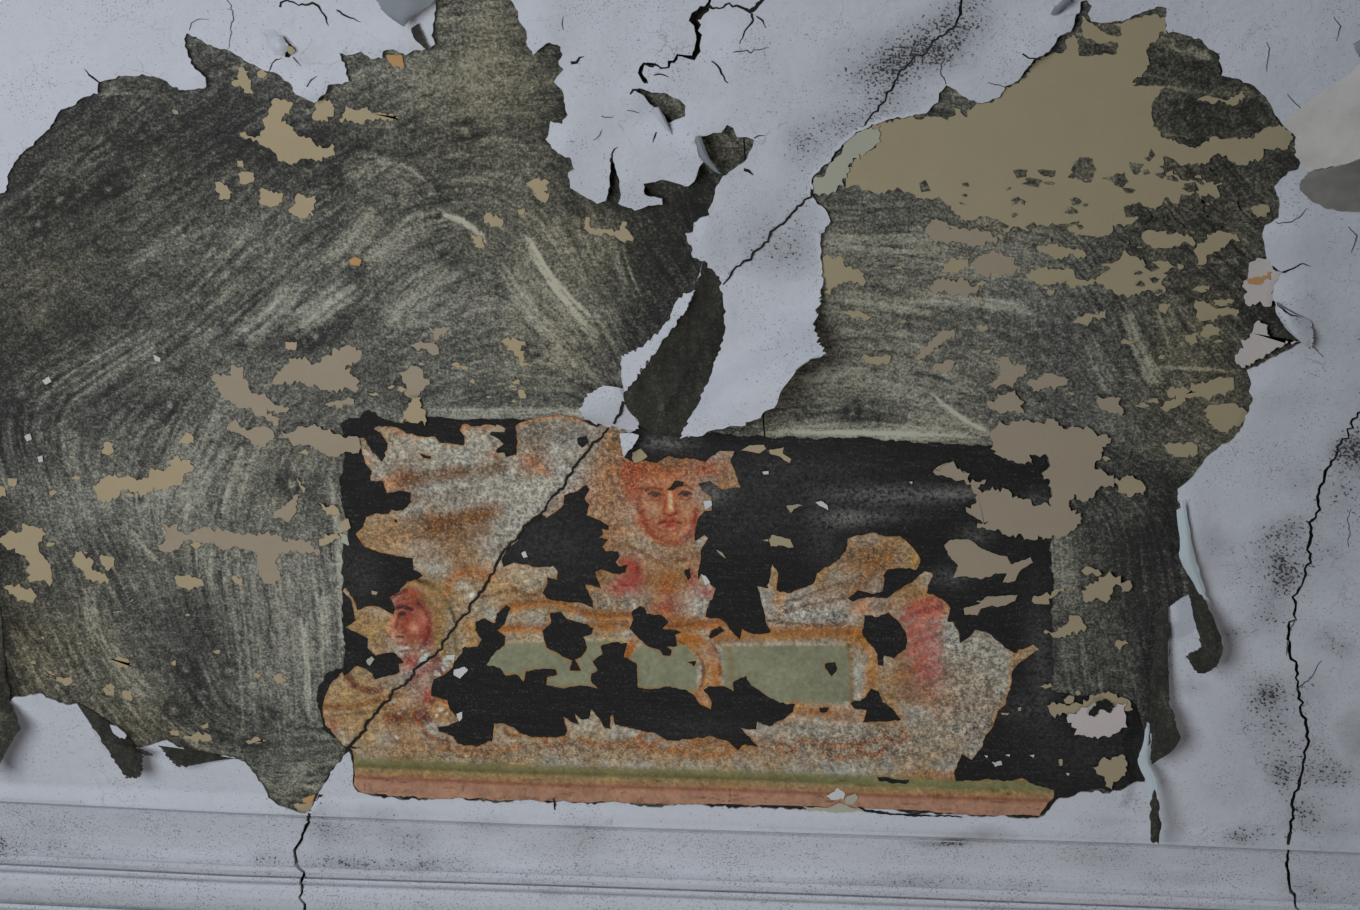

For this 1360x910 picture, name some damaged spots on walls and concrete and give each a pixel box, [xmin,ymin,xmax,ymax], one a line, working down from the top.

crack [279,0,360,26]
crack [594,0,766,163]
crack [866,0,963,121]
crack [723,189,813,284]
peeling [0,0,745,813]
peeling [620,0,1301,739]
water stain [1228,410,1360,635]
crack [294,401,625,910]
crack [1285,412,1360,905]
peeling [772,788,864,813]
peeling [1087,754,1140,793]
water stain [1222,675,1354,845]